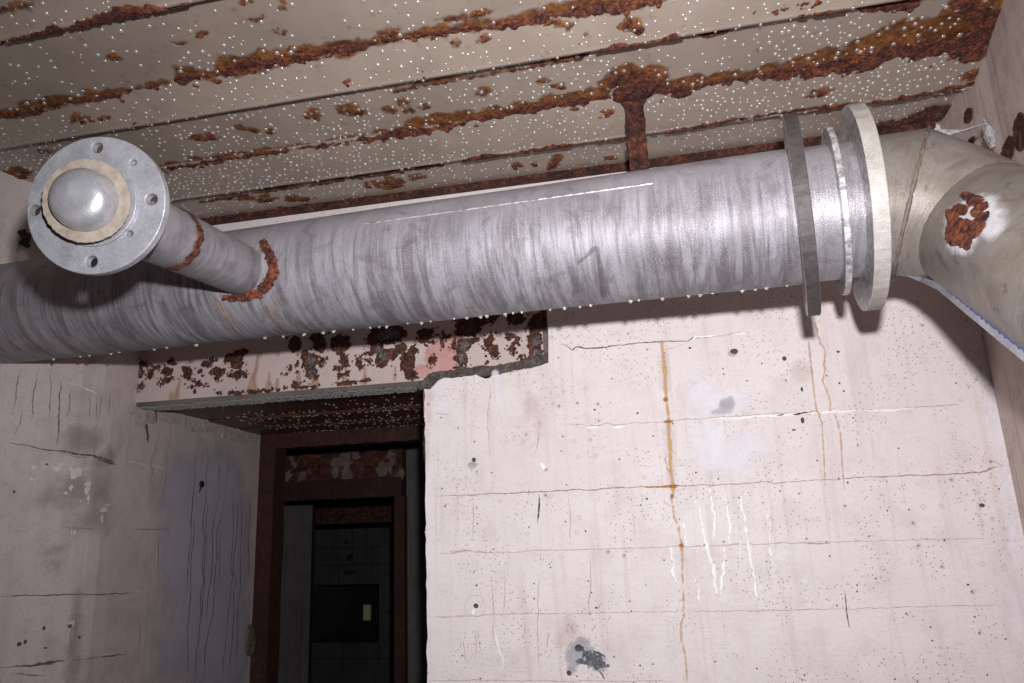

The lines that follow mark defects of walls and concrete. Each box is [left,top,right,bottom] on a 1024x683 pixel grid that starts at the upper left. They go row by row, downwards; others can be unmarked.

rust [0,0,1003,174]
rust [1,167,33,180]
rust [199,162,448,215]
spalling [416,334,548,390]
crack [563,331,747,350]
crack [560,404,963,428]
rust [809,324,844,479]
rust [661,341,684,581]
crack [444,460,1001,524]
crack [439,538,993,554]
leakage [693,489,789,605]
crack [430,605,991,682]